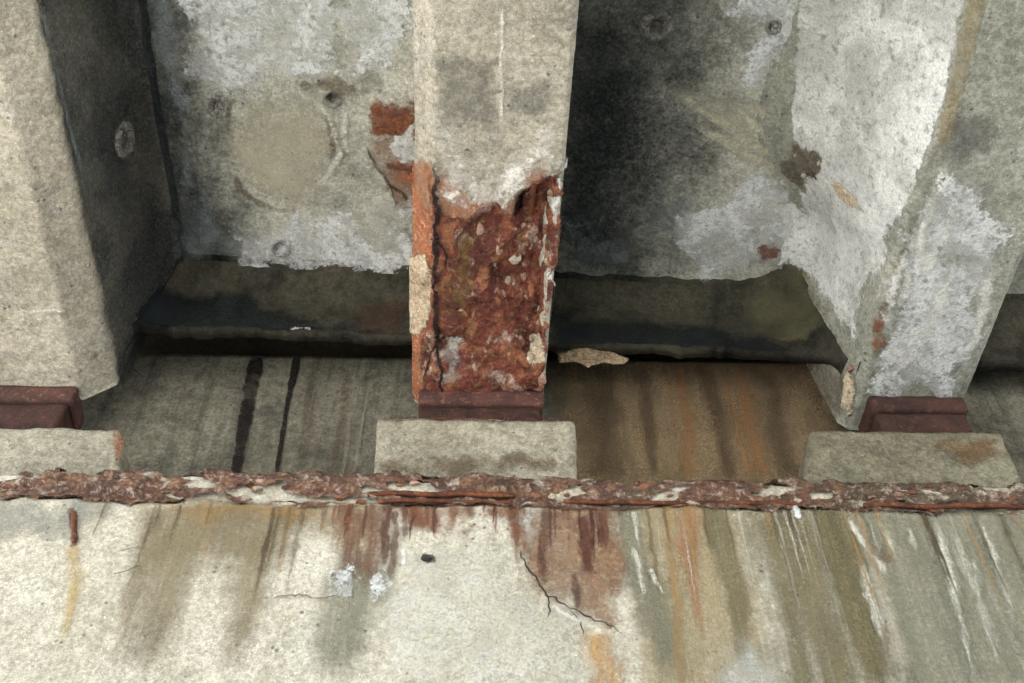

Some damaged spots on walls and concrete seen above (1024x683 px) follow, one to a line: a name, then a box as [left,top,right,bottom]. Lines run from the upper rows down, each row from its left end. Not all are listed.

crack [367,149,448,392]
corrosion [369,99,546,401]
spalling [409,172,629,392]
water stain [439,0,1020,398]
corrosion [68,508,78,558]
corrosion [329,503,626,683]
crack [520,551,621,634]
water stain [619,505,772,683]
water stain [749,508,1024,683]